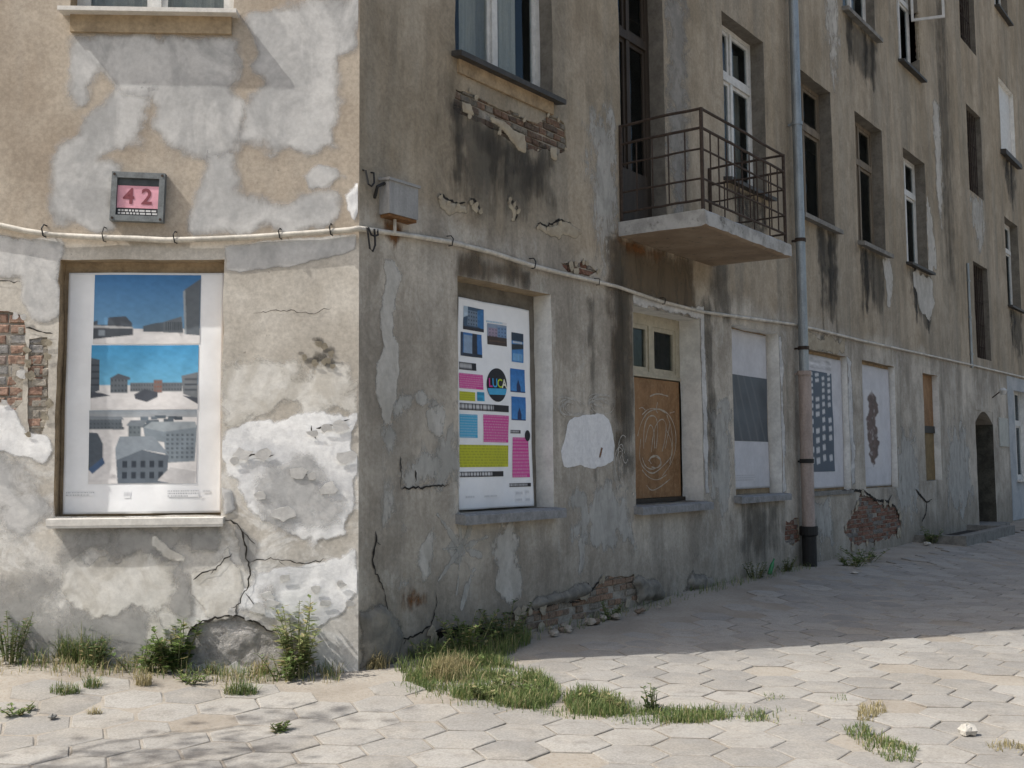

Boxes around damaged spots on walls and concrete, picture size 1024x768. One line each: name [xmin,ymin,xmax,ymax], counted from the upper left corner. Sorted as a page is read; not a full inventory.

leakage [454,104,545,215]
flaking render [453,88,567,161]
leakage [819,228,837,320]
peeling [913,197,937,320]
flaking render [0,311,54,464]
peeling [221,338,358,546]
crack [400,456,448,490]
flaking render [815,427,919,556]
crack [842,489,932,525]
crack [188,520,323,638]
crack [372,531,388,609]
crack [404,577,607,644]